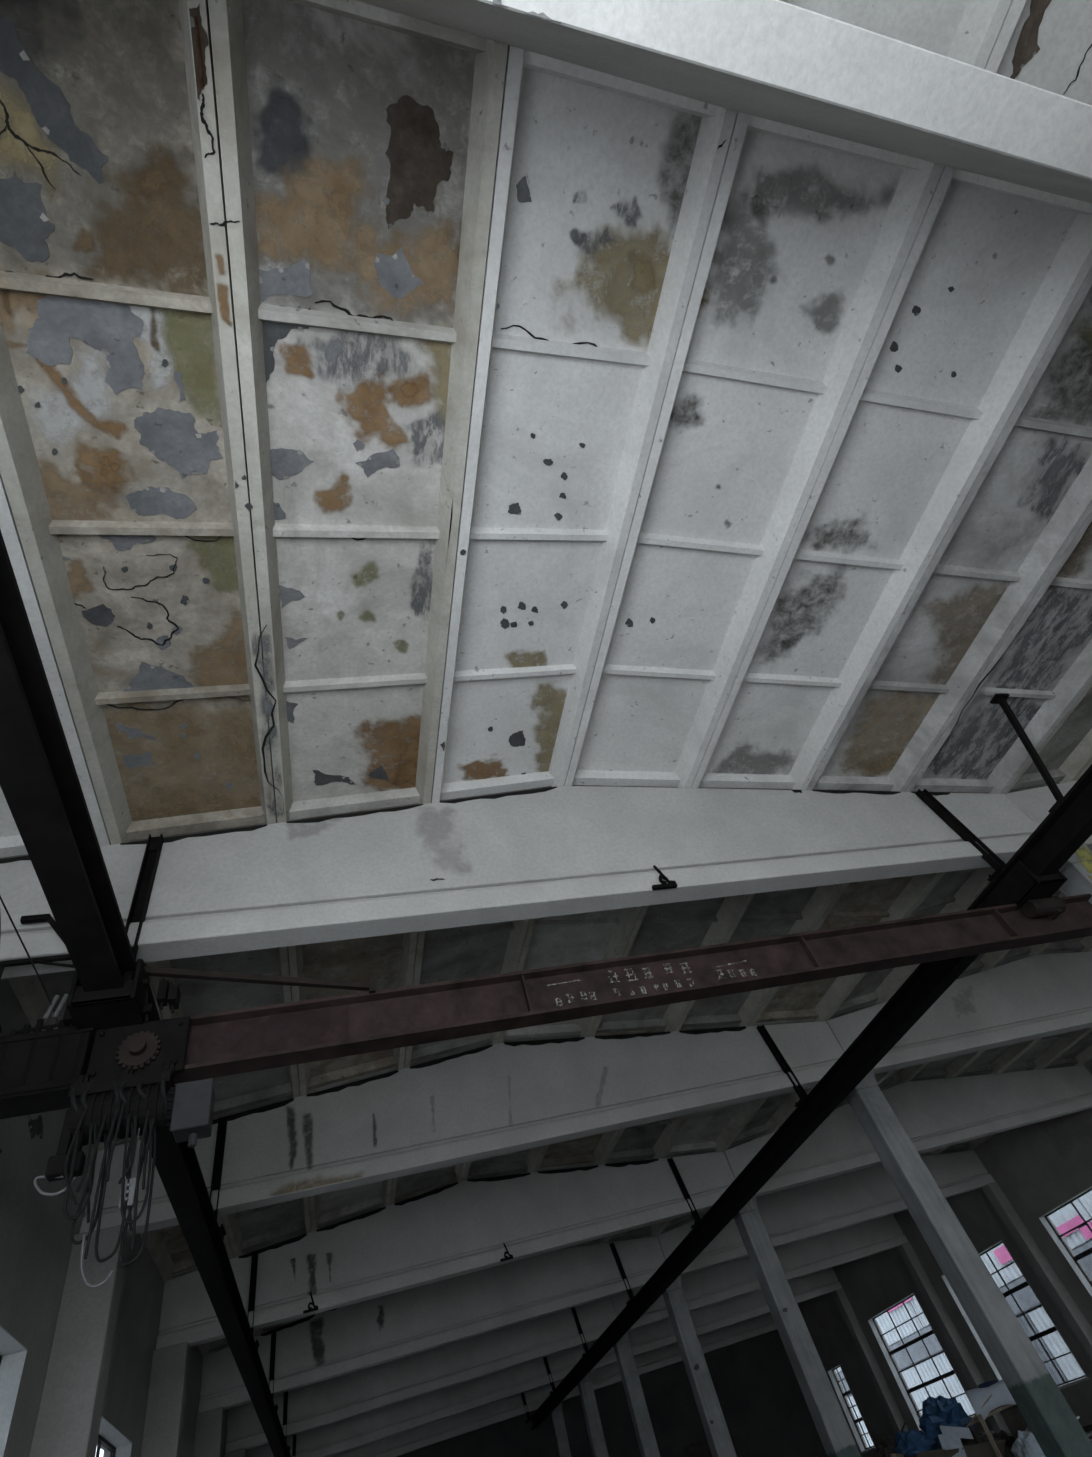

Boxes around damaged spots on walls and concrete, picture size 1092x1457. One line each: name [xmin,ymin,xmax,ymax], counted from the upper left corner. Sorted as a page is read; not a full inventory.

spalling [189,5,209,100]
spalling [1010,0,1052,79]
spalling [384,95,453,229]
leakage [662,120,700,215]
leakage [577,230,670,342]
leakage [700,175,843,307]
peeling [26,295,223,519]
peeling [270,448,314,480]
peeling [353,413,445,478]
crack [75,536,221,646]
leakage [1049,524,1092,588]
leakage [844,587,1006,777]